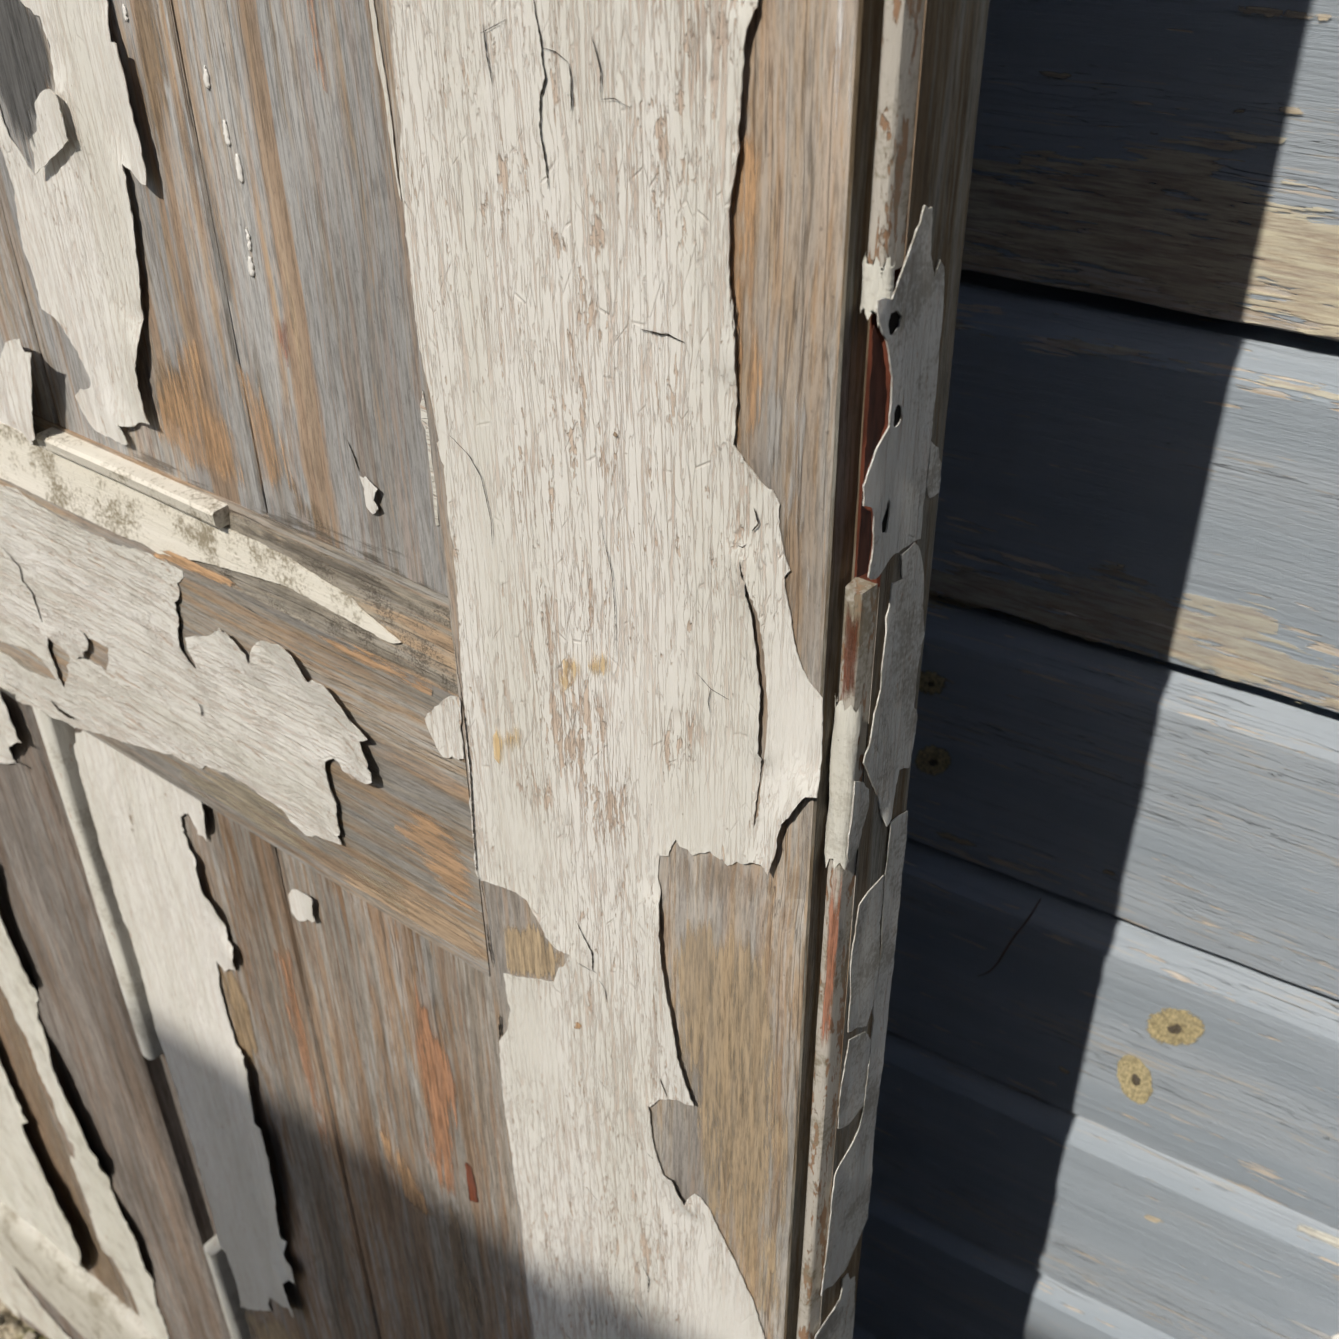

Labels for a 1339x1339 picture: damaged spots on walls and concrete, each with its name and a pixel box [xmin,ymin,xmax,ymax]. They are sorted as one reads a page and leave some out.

peeling [0,0,149,445]
peeling [203,65,211,89]
peeling [223,119,244,184]
peeling [245,227,255,277]
peeling [0,338,401,1339]
peeling [369,0,945,1339]